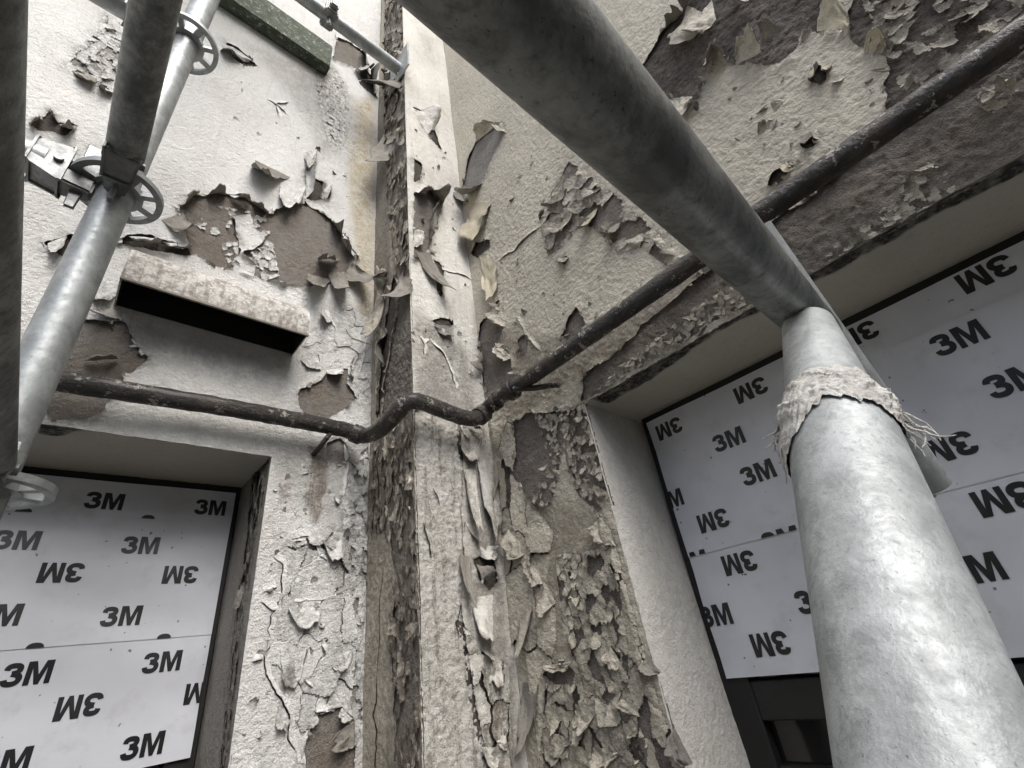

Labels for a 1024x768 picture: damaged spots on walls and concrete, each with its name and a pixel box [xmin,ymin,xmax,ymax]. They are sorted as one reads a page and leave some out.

peeling [66,14,122,95]
peeling [643,0,1024,115]
peeling [29,108,78,136]
peeling [118,0,529,418]
peeling [515,156,684,266]
peeling [750,99,830,188]
peeling [772,51,1024,276]
peeling [64,279,148,380]
peeling [47,391,110,422]
peeling [219,266,757,768]
crack [252,530,344,768]